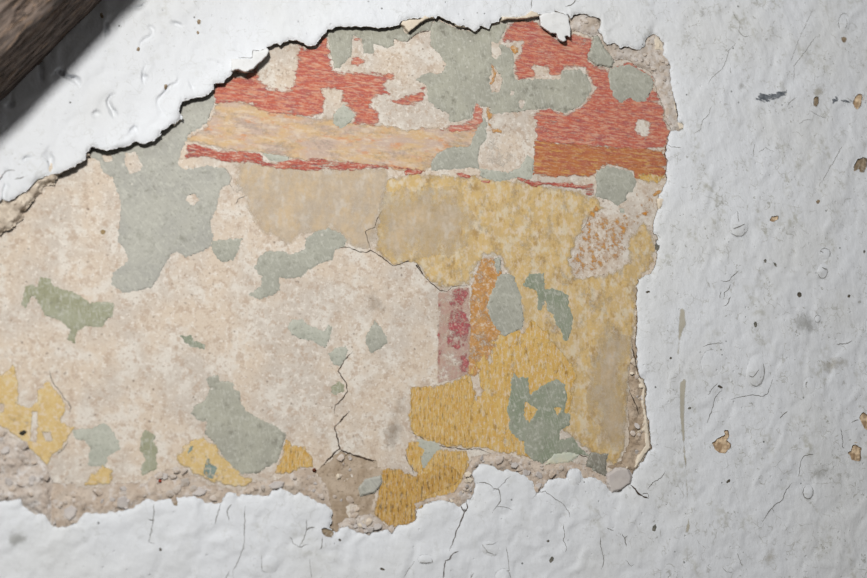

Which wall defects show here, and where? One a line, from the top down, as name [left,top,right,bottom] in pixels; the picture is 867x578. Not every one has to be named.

peeling [853,158,866,172]
flaking render [0,11,682,541]
crack [322,354,375,466]
peeling [712,430,730,453]
peeling [848,442,860,461]
crack [443,500,468,578]